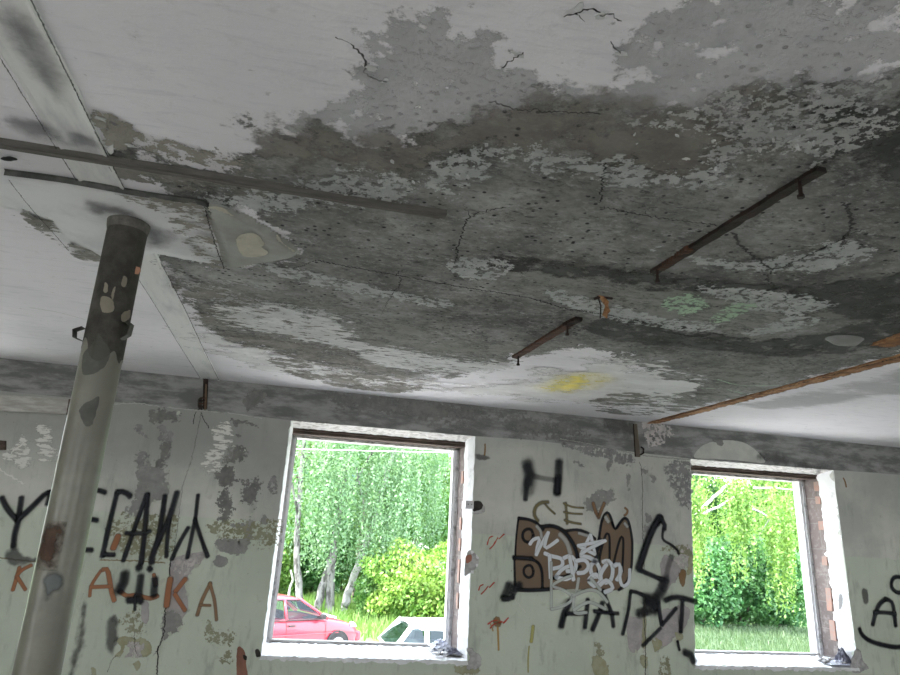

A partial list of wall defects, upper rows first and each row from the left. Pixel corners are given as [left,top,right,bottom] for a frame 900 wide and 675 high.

crack [335,37,387,82]
crack [564,8,621,54]
peeling [90,111,268,269]
damp [107,67,900,407]
corrosion [657,245,693,271]
crack [598,162,872,294]
peeling [515,268,846,339]
peeling [171,278,571,430]
corrosion [654,333,900,423]
flaking render [105,389,283,640]
peeling [561,443,694,512]
crack [107,608,166,675]